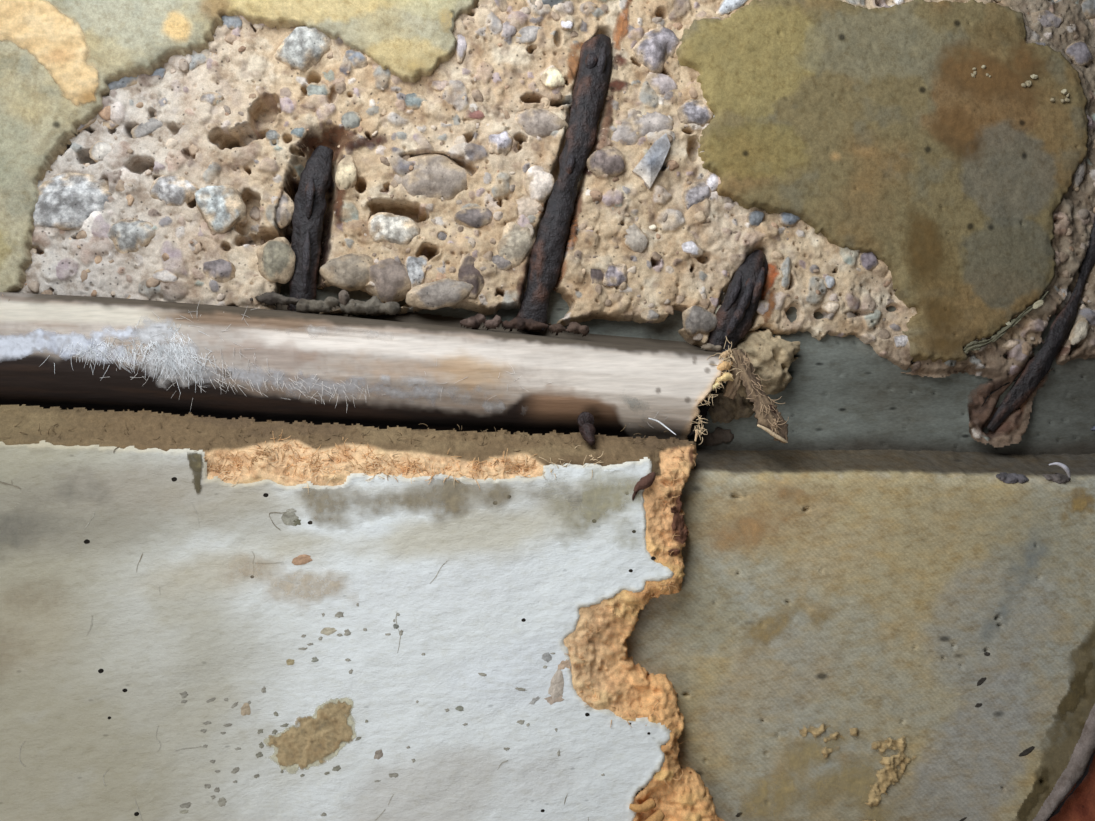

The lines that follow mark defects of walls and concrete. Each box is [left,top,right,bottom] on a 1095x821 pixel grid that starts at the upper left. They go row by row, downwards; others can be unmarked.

damp [942,47,1040,95]
corrosion [296,126,386,163]
corrosion [284,178,345,291]
spalling [14,0,1095,447]
corrosion [566,190,581,249]
corrosion [517,264,529,302]
corrosion [724,264,778,340]
corrosion [968,357,1047,437]
peeling [206,698,251,716]
peeling [256,698,368,777]
damp [1017,627,1095,821]
peeling [204,784,227,807]